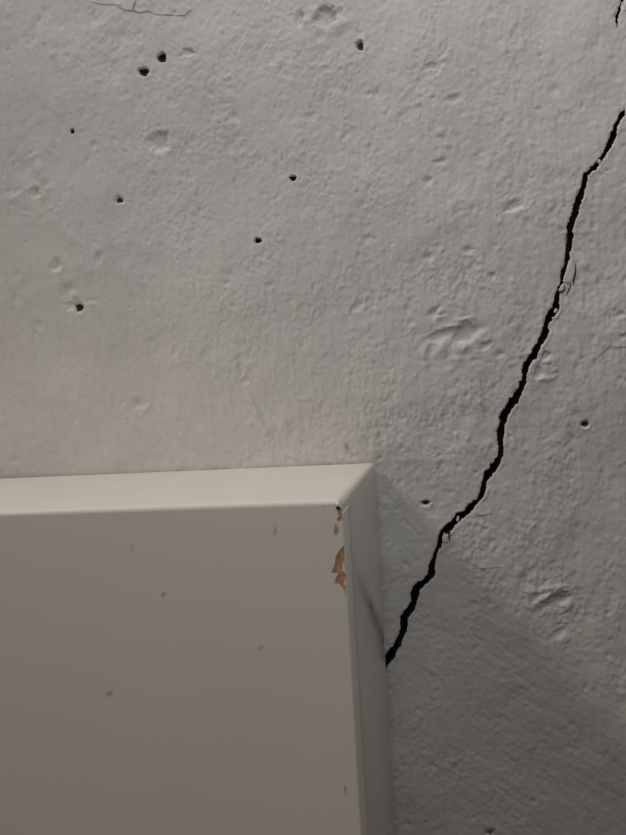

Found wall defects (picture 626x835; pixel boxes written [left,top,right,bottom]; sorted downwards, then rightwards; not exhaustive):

crack [612,0,626,29]
crack [385,86,626,675]